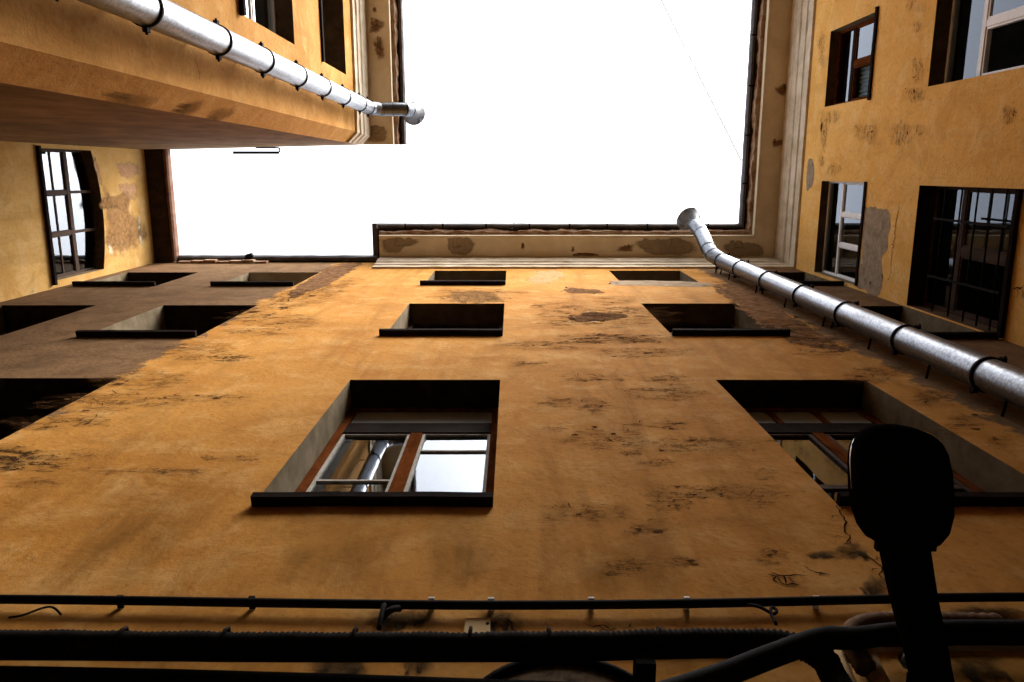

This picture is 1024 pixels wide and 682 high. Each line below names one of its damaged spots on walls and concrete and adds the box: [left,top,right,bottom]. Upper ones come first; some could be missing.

flaking render [806,159,840,191]
flaking render [857,206,891,297]
crack [832,505,886,582]